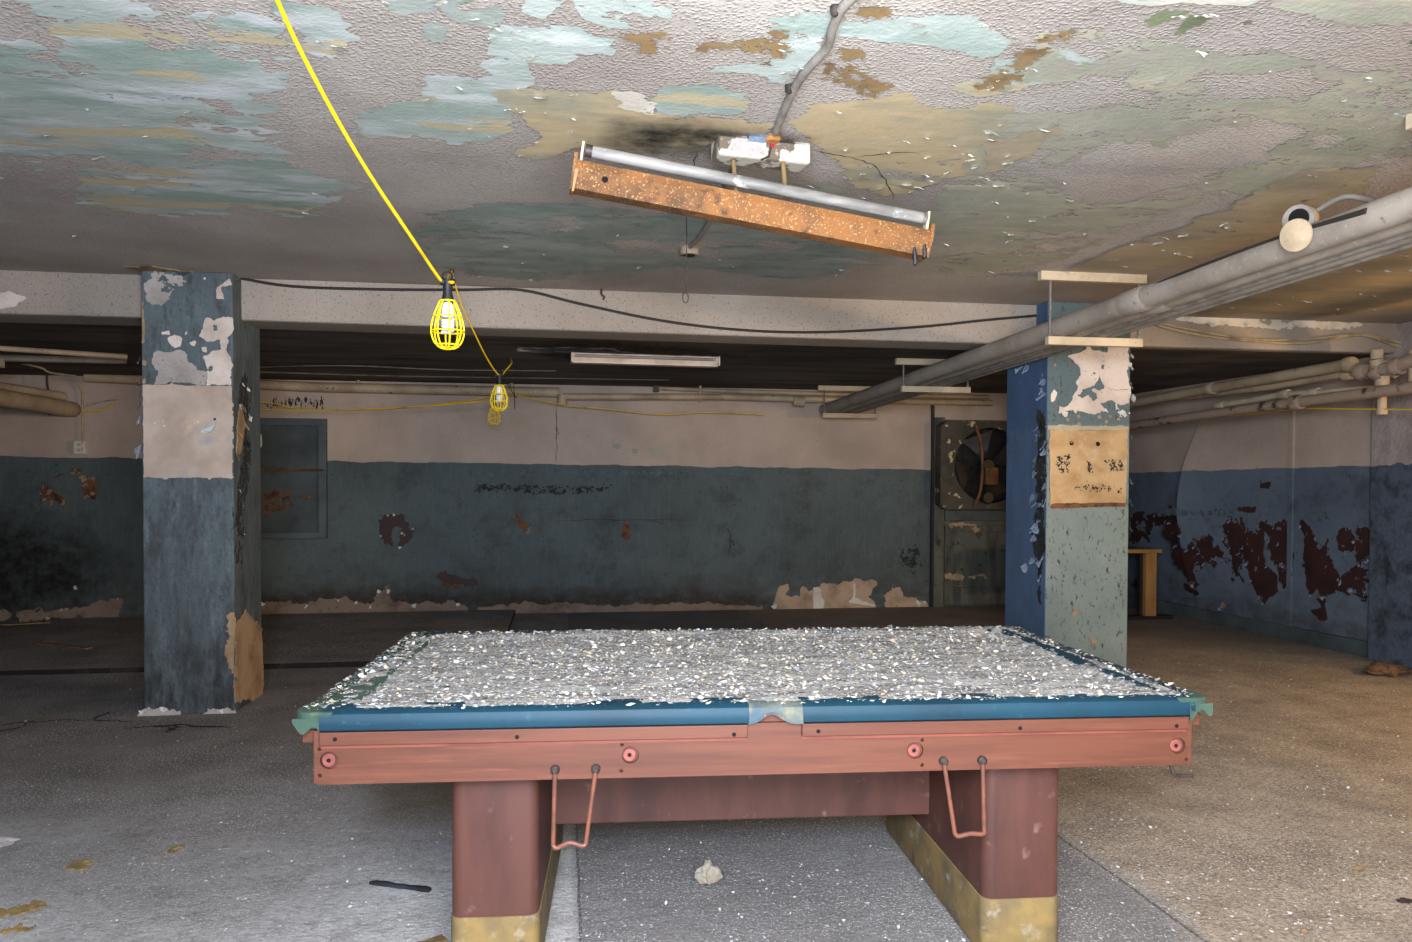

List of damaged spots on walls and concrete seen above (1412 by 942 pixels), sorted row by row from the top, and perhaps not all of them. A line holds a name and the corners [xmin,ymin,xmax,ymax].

peeling [0,0,375,218]
peeling [349,0,1412,282]
peeling [0,291,26,309]
peeling [39,469,99,506]
flaking render [125,265,313,564]
peeling [378,514,414,549]
flaking render [1015,346,1370,621]
spalling [204,571,1193,714]